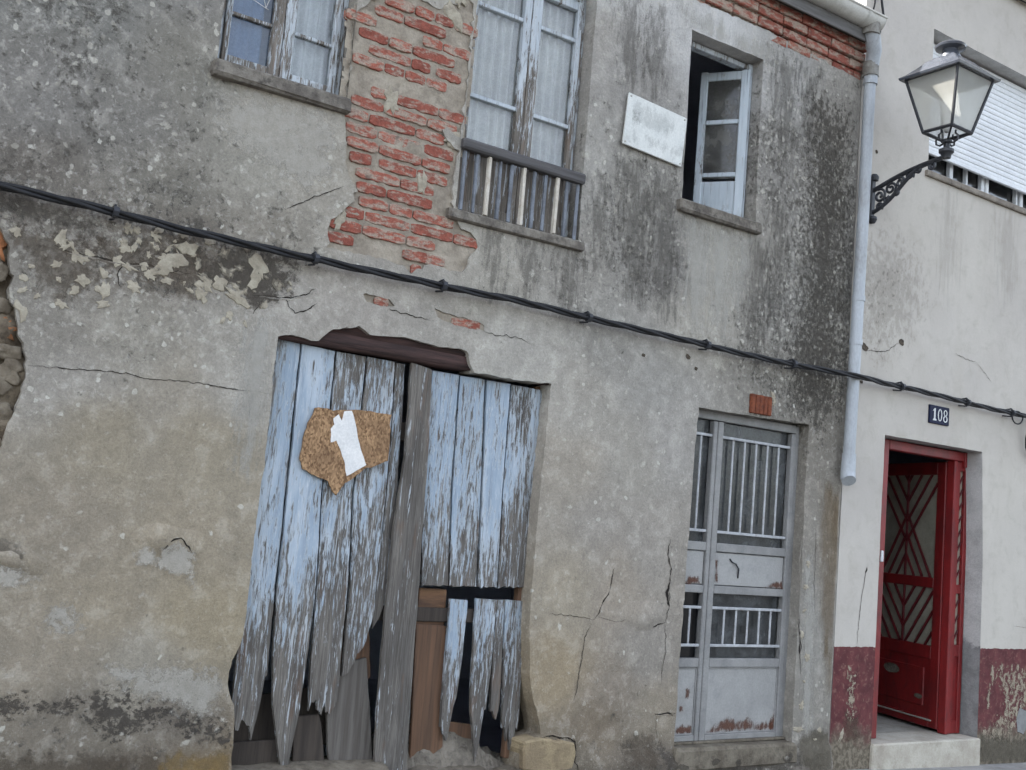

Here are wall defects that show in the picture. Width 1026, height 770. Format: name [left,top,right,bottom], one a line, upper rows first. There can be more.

flaking render [327,0,478,273]